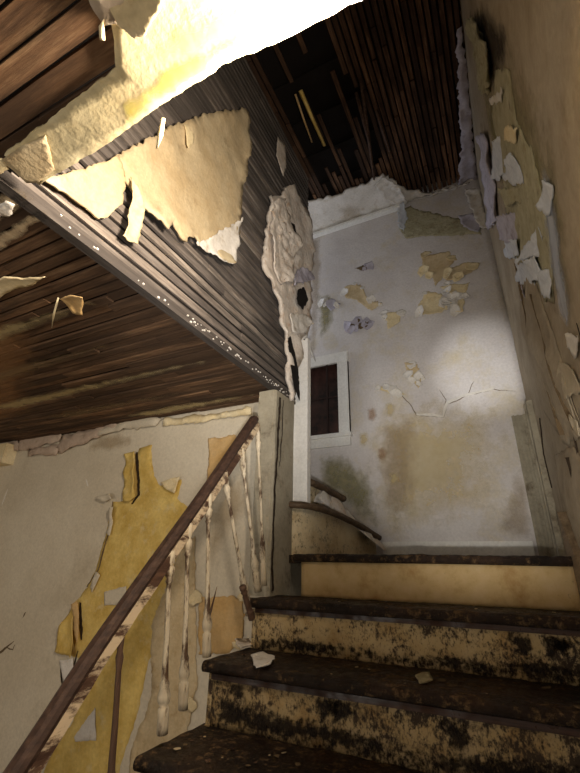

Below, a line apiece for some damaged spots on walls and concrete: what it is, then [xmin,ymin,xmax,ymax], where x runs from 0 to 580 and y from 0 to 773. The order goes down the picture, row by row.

flaking render [99,0,163,41]
flaking render [0,107,252,264]
peeling [261,17,554,401]
peeling [565,332,579,359]
peeling [207,434,236,479]
crack [539,418,552,488]
crack [556,361,580,476]
peeling [55,445,187,684]
peeling [44,536,275,773]
leakage [259,634,580,684]
leakage [217,685,579,773]